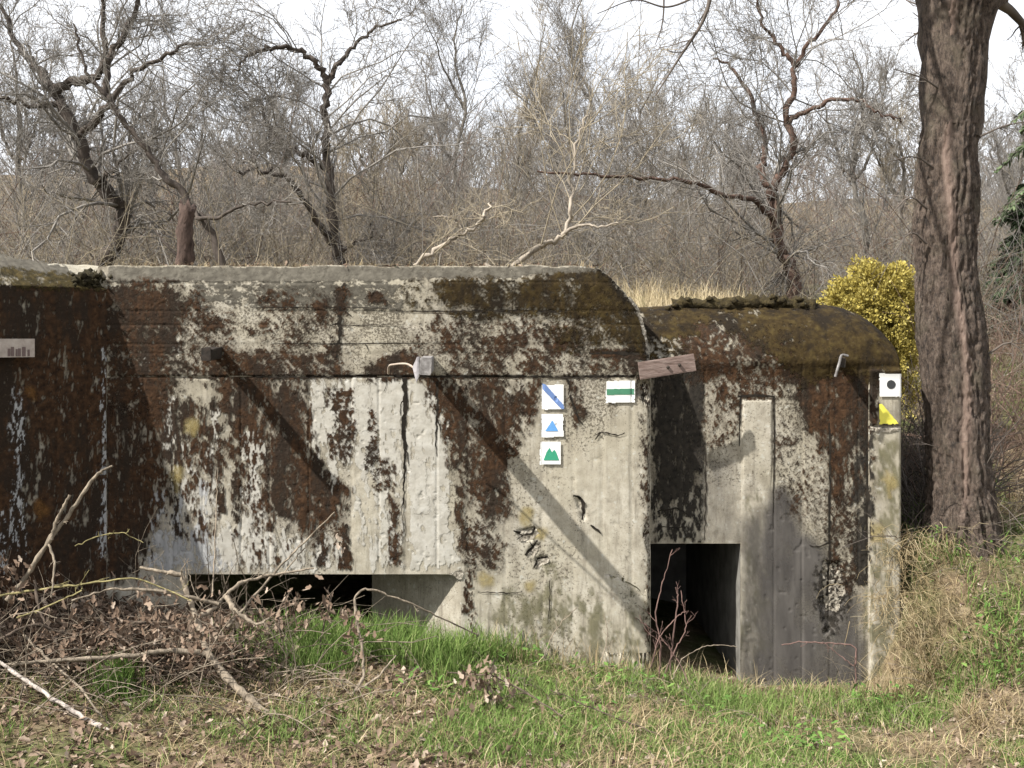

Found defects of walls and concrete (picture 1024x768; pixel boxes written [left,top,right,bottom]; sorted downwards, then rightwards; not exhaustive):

water stain [0,389,27,574]
water stain [98,348,107,558]
water stain [454,484,477,639]
spalling [518,526,549,569]
water stain [743,377,875,686]